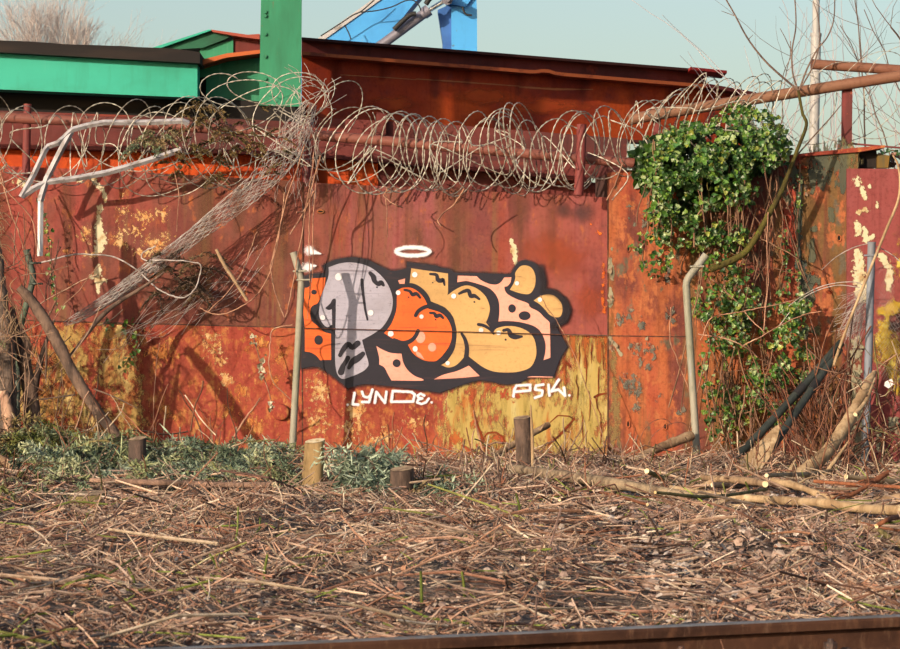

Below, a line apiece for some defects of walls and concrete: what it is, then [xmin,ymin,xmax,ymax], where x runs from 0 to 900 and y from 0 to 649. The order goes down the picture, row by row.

rust [373,98,413,111]
rust [453,89,578,113]
peeling [77,178,109,294]
rust [113,205,176,258]
peeling [777,138,879,316]
peeling [877,252,894,292]
rust [31,323,179,442]
rust [202,330,262,431]
rust [306,369,398,450]
rust [405,335,607,463]
peeling [607,247,658,414]